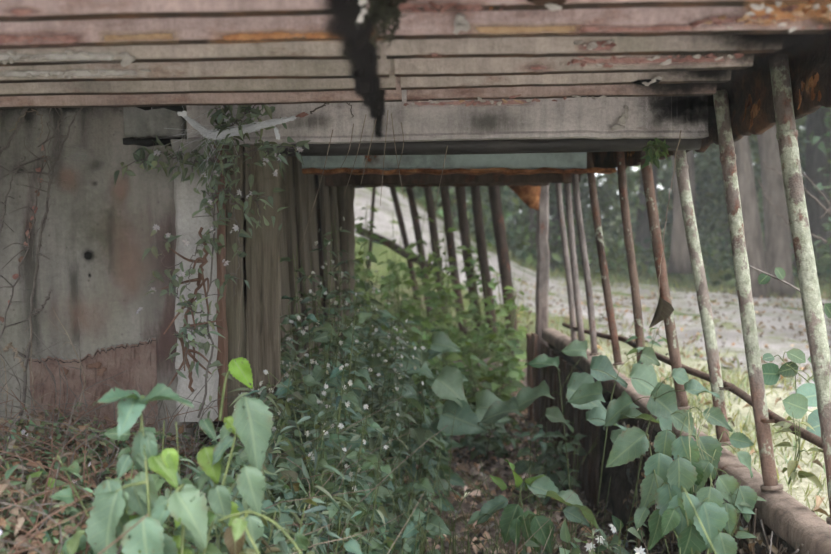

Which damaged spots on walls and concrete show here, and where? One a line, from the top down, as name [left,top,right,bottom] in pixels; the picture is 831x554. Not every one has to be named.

peeling [689,0,831,33]
spalling [29,337,158,438]